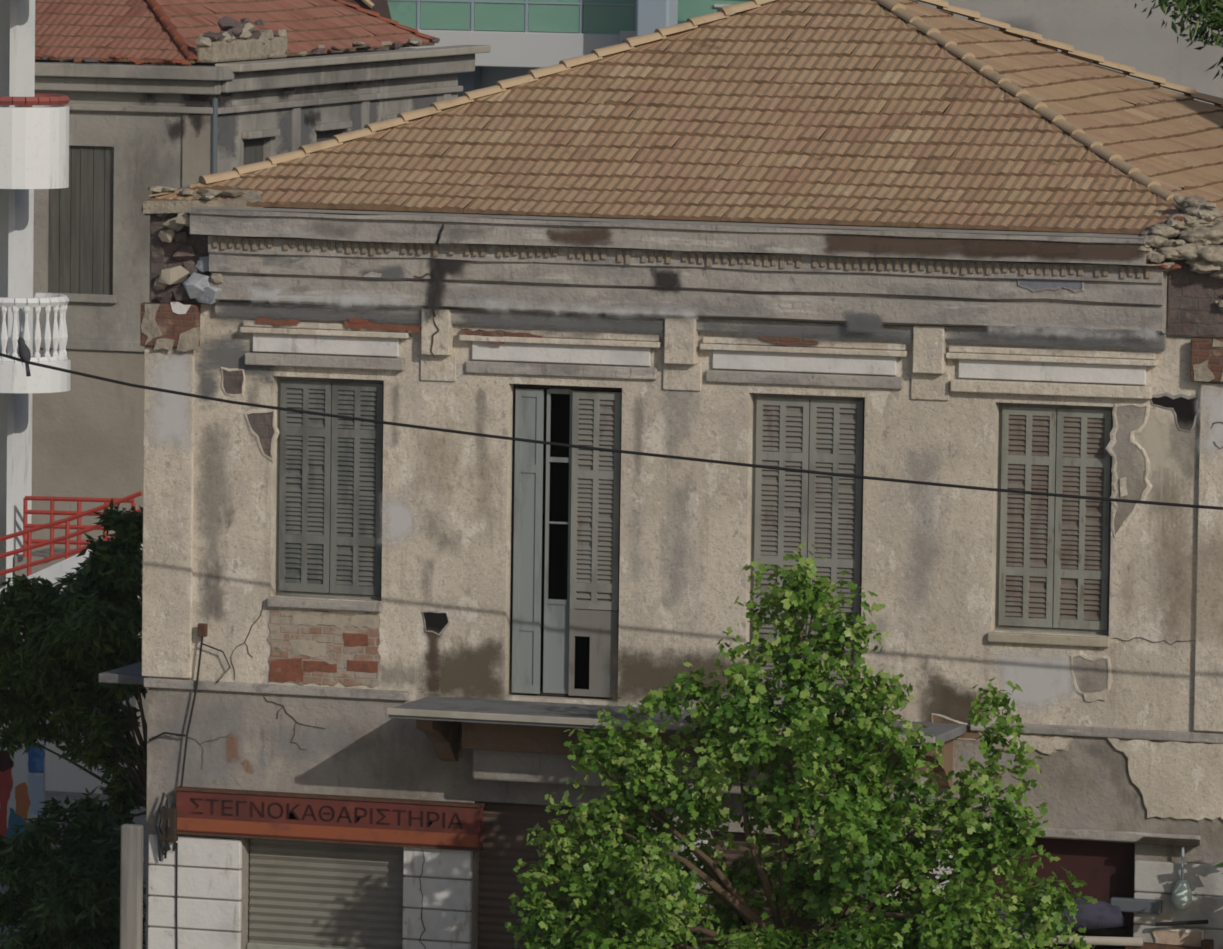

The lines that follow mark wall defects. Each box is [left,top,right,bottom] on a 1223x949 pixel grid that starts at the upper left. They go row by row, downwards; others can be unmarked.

spalling [140,180,264,352]
spalling [220,367,246,397]
peeling [243,408,280,463]
peeling [1106,338,1223,538]
crack [230,604,263,680]
flaking render [267,610,381,688]
damp [422,642,502,699]
damp [616,652,746,702]
crack [154,734,230,769]
crack [263,696,325,751]
peeling [931,713,1073,757]
peeling [1105,738,1223,823]